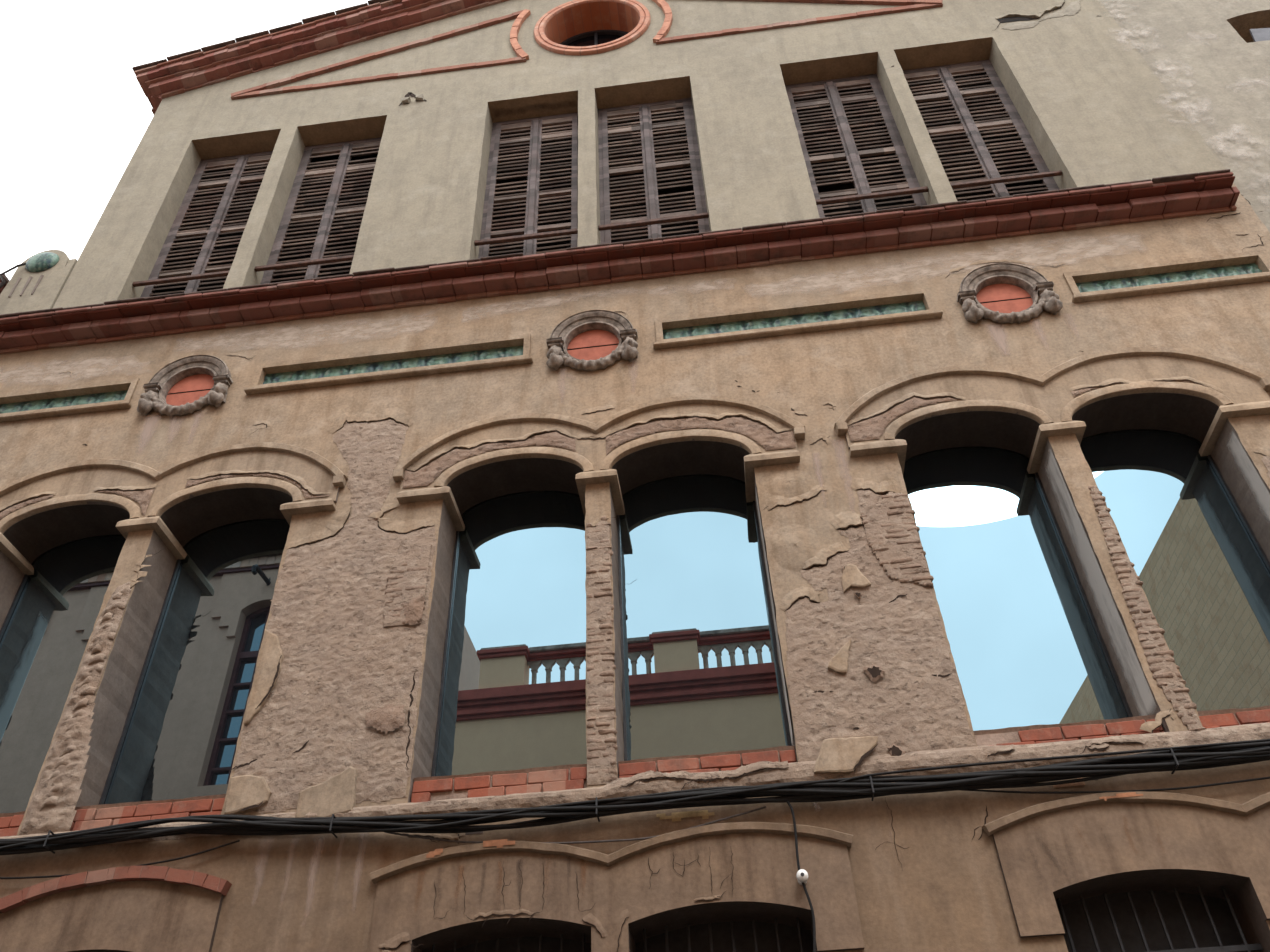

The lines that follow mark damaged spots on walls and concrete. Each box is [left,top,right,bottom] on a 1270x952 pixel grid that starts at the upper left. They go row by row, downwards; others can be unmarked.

crack [992,0,1078,31]
flaking render [185,470,331,498]
crack [577,405,615,440]
flaking render [19,582,132,835]
flaking render [224,407,577,818]
flaking render [778,478,977,774]
flaking render [1088,486,1206,731]